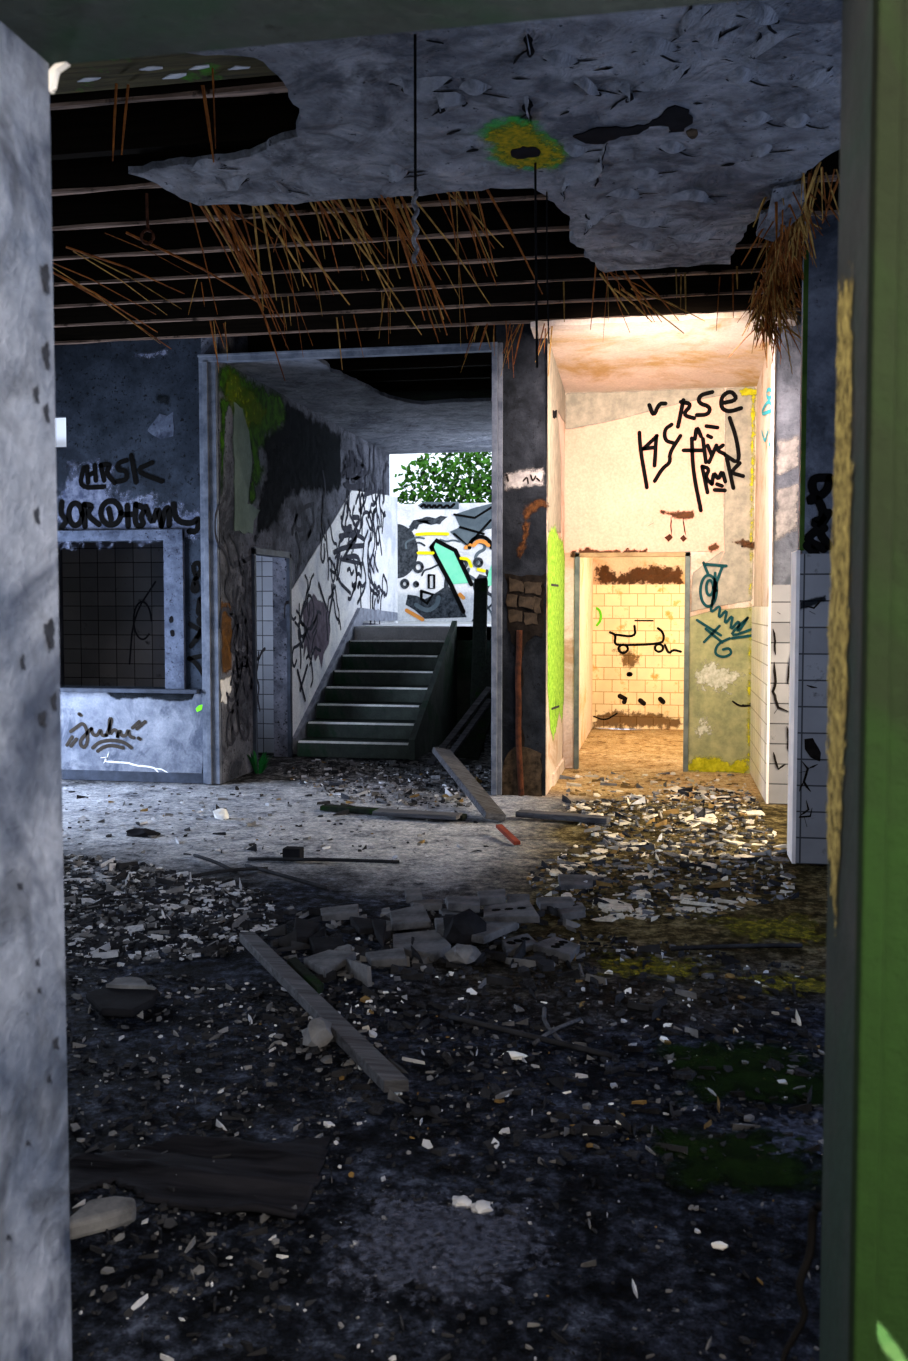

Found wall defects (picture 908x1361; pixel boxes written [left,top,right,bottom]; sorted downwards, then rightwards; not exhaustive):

peeling [49,62,71,95]
damp [478,116,568,170]
flaking render [573,105,698,144]
damp [220,398,231,489]
rust [517,499,549,557]
flaking render [502,573,546,797]
crack [101,753,167,772]